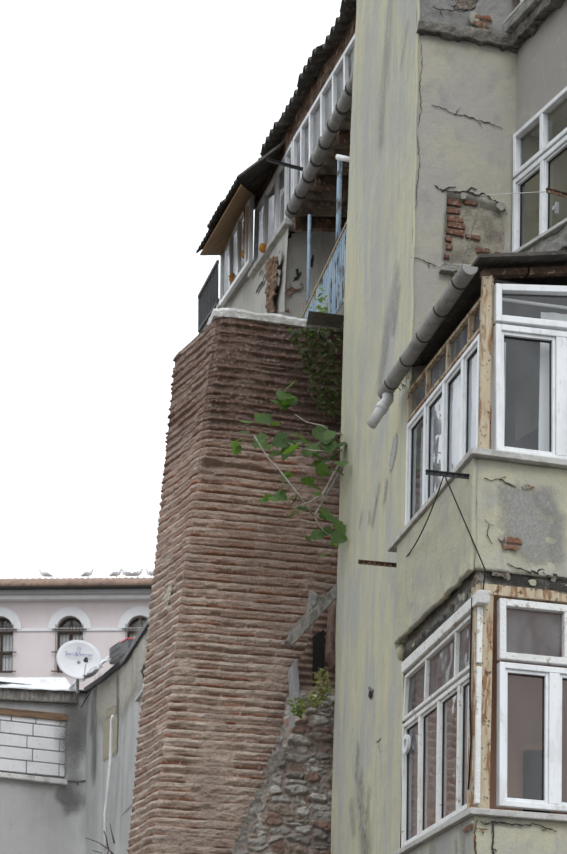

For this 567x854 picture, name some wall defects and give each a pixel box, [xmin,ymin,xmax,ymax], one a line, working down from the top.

flaking render [449,0,492,30]
crack [416,45,507,214]
flaking render [439,192,506,276]
flaking render [264,250,302,317]
flaking render [498,533,522,551]
crack [473,820,557,854]